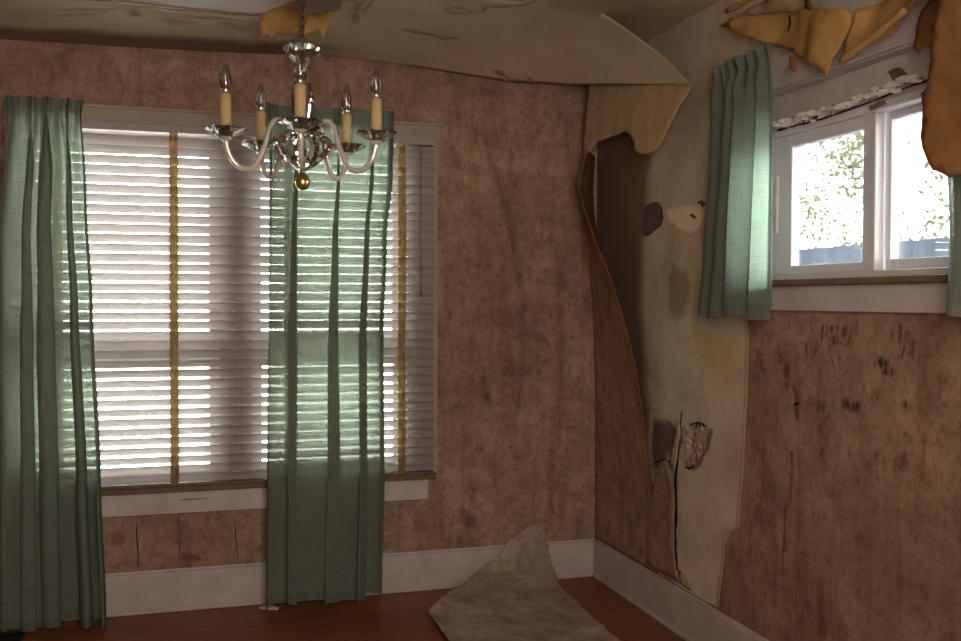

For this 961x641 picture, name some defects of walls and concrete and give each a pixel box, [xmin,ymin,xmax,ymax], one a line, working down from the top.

damp [442,0,689,18]
flaking render [815,0,885,20]
peeling [773,67,929,131]
damp [597,132,659,452]
flaking render [579,0,798,607]
damp [664,254,745,407]
damp [811,351,901,419]
crack [650,412,694,591]